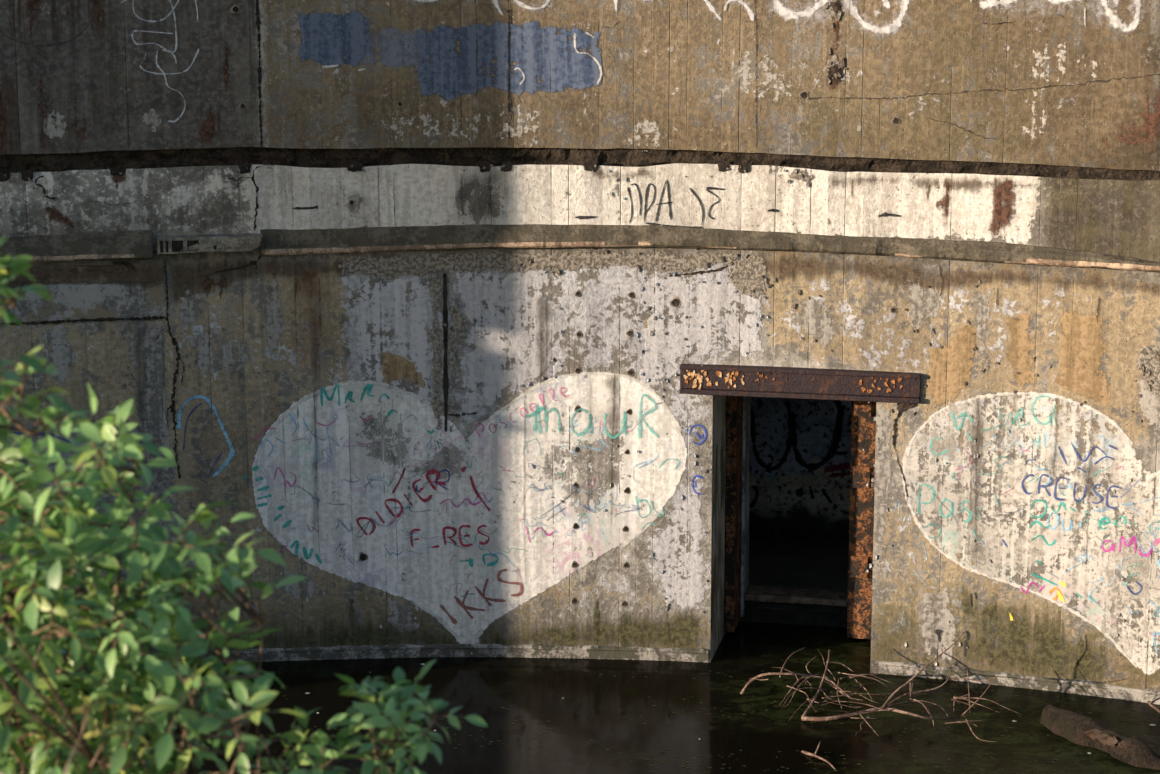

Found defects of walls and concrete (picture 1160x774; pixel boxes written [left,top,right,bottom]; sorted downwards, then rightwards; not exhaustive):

corrosion [988,179,1016,235]
crack [201,254,261,279]
crack [1,261,185,479]